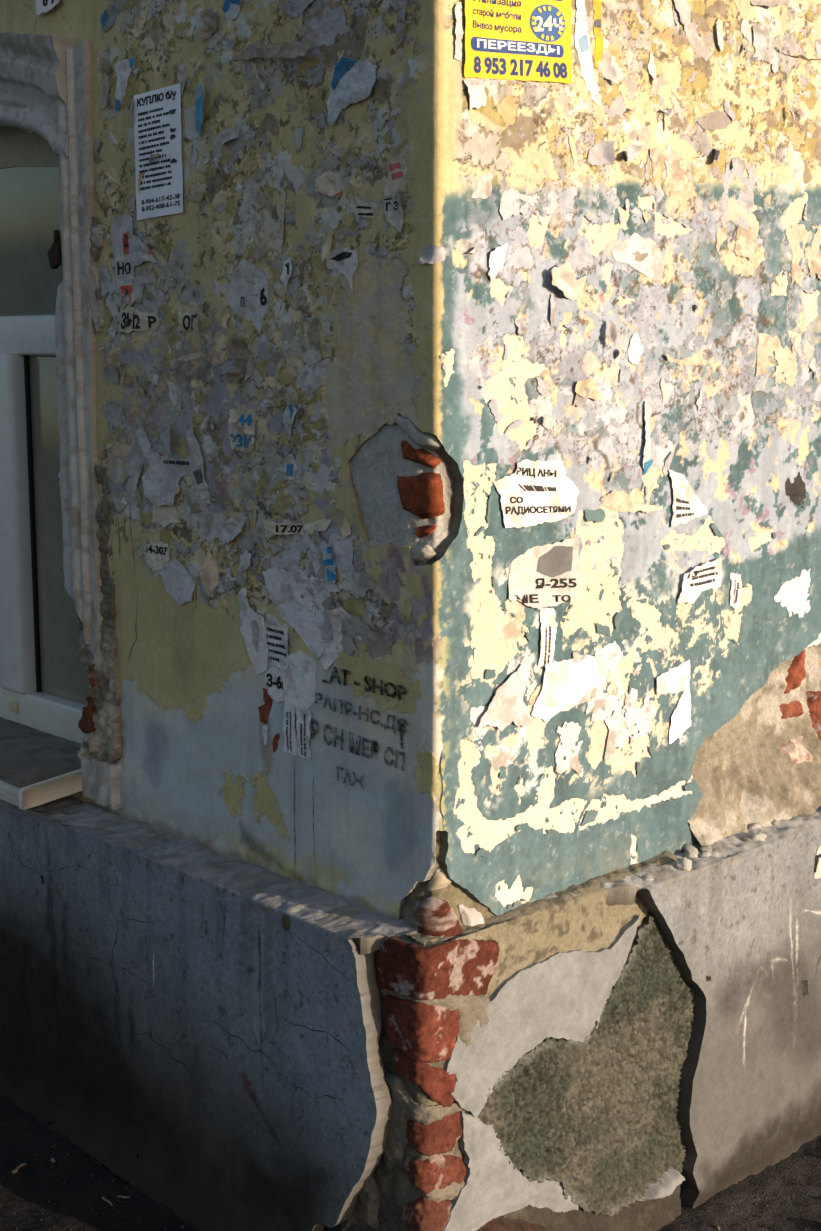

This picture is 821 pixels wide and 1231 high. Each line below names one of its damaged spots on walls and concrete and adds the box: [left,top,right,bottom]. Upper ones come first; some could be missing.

peeling [440,349,455,387]
peeling [483,334,547,451]
peeling [578,195,692,309]
peeling [781,192,808,232]
peeling [770,271,820,351]
spalling [76,465,124,765]
spalling [351,414,531,680]
peeling [560,507,666,776]
peeling [721,583,752,645]
spalling [453,642,821,857]
crack [7,833,357,1129]
spalling [323,831,711,1231]